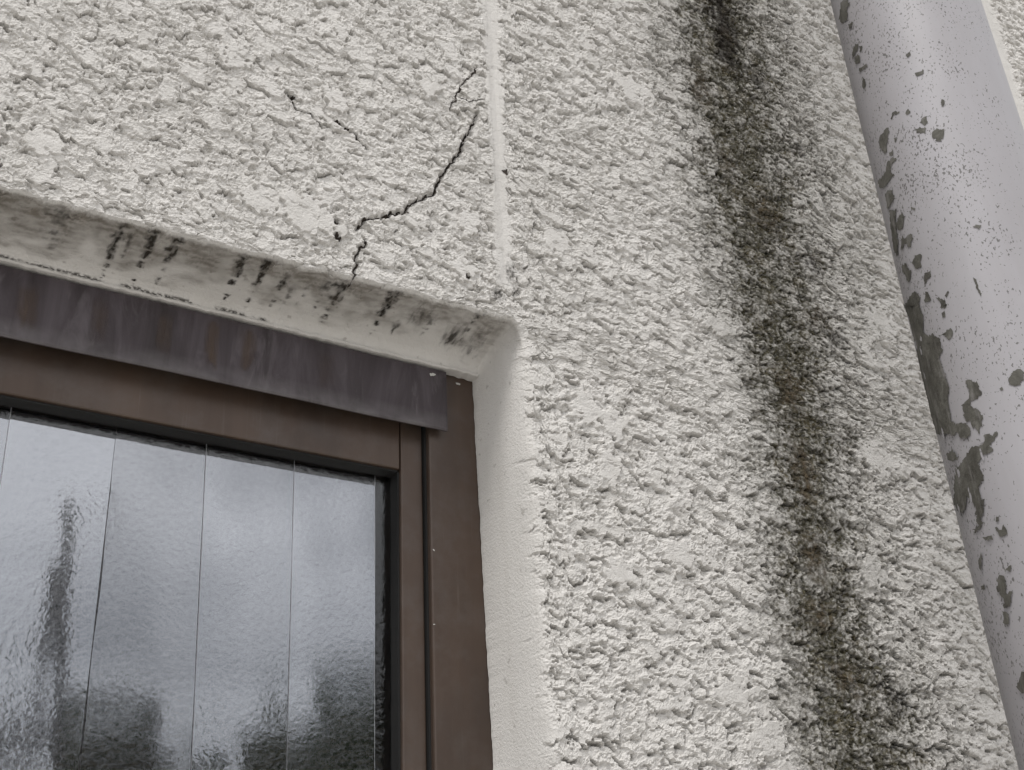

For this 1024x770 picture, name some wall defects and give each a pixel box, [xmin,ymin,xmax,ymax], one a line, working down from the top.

crack [292,101,366,148]
crack [347,68,484,288]
leakage [0,191,220,281]
leakage [224,257,368,317]
leakage [375,292,402,326]
leakage [663,0,933,770]